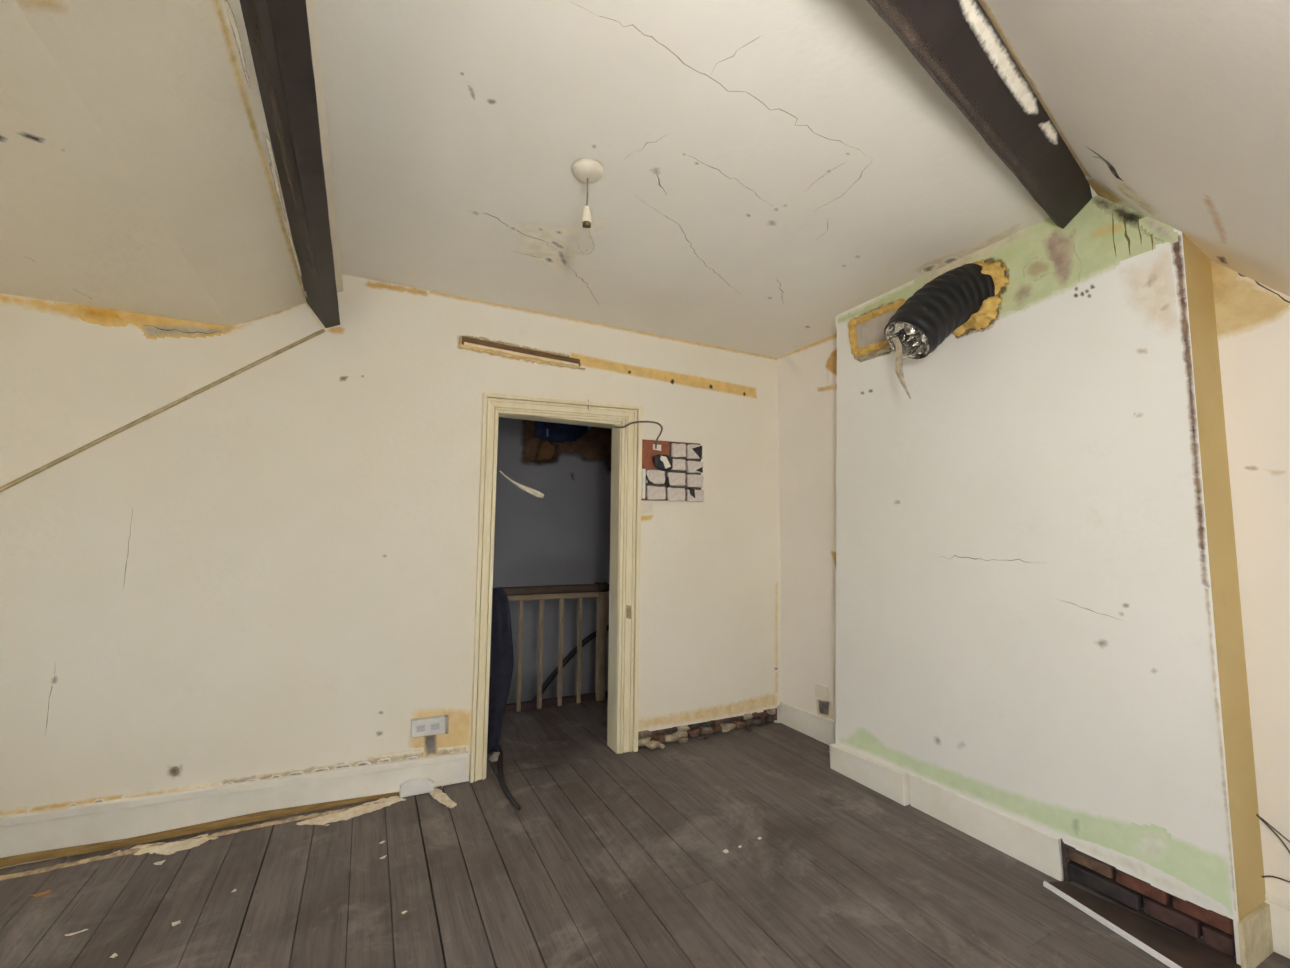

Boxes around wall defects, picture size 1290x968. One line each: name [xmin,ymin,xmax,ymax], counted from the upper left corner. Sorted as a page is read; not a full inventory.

flaking render [16,0,74,18]
spalling [0,129,67,153]
peeling [209,0,346,336]
crack [571,2,866,225]
peeling [0,293,256,340]
peeling [364,0,1236,957]
peeling [0,705,472,816]